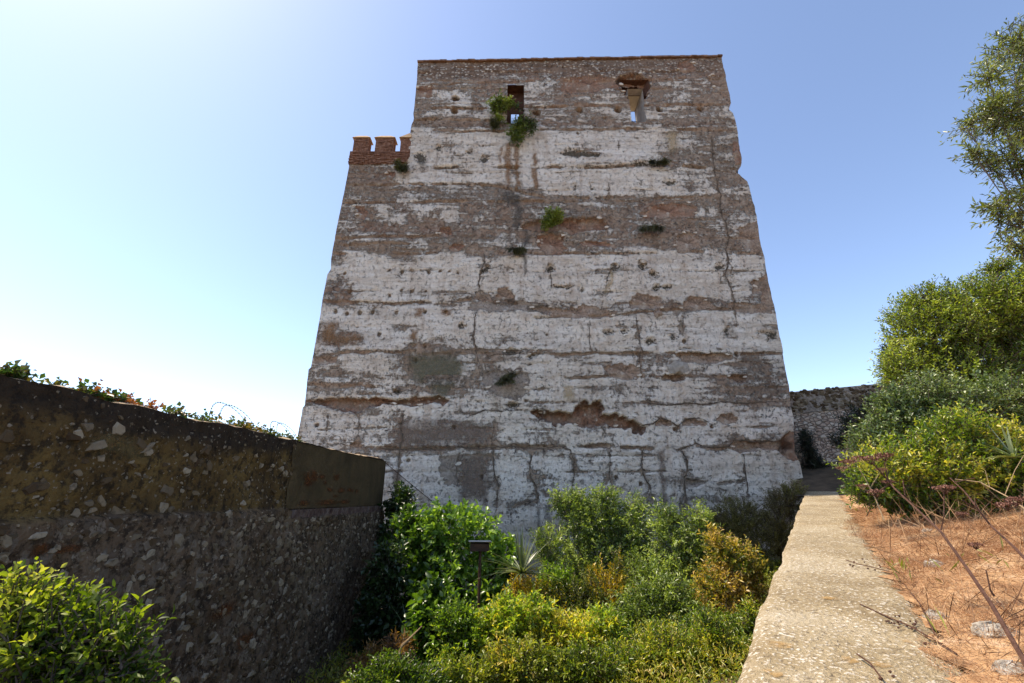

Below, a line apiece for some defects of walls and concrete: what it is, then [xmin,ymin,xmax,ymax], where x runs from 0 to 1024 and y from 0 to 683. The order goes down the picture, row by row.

spalling [519,216,610,273]
crack [704,137,738,323]
crack [472,256,516,372]
spalling [531,397,738,436]
crack [641,401,789,508]
spalling [728,431,798,461]